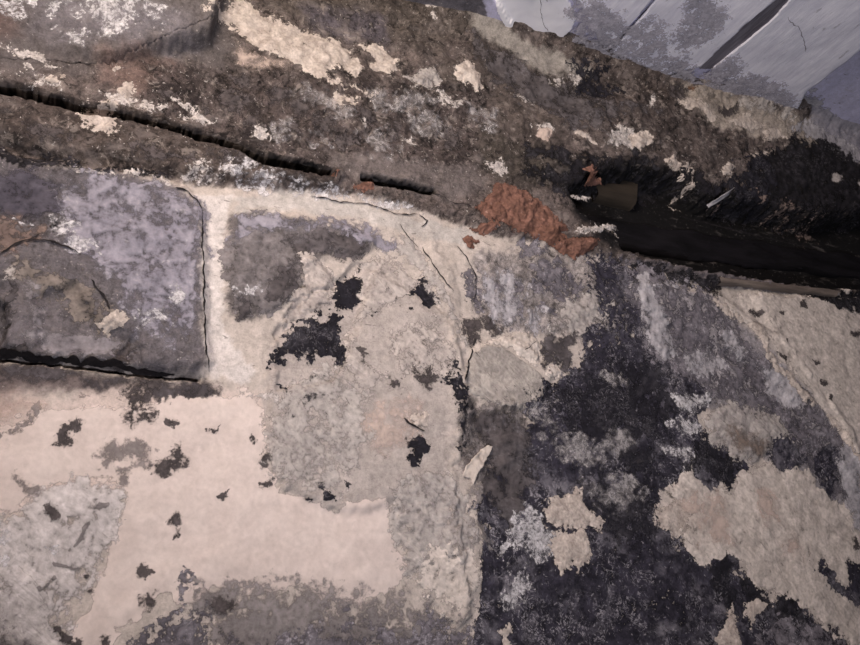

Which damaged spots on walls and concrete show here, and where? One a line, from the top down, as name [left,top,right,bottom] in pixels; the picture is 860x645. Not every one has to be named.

damp [702,151,778,225]
crack [176,187,209,365]
flaking render [282,251,337,331]
crack [0,348,174,377]
damp [193,212,850,645]